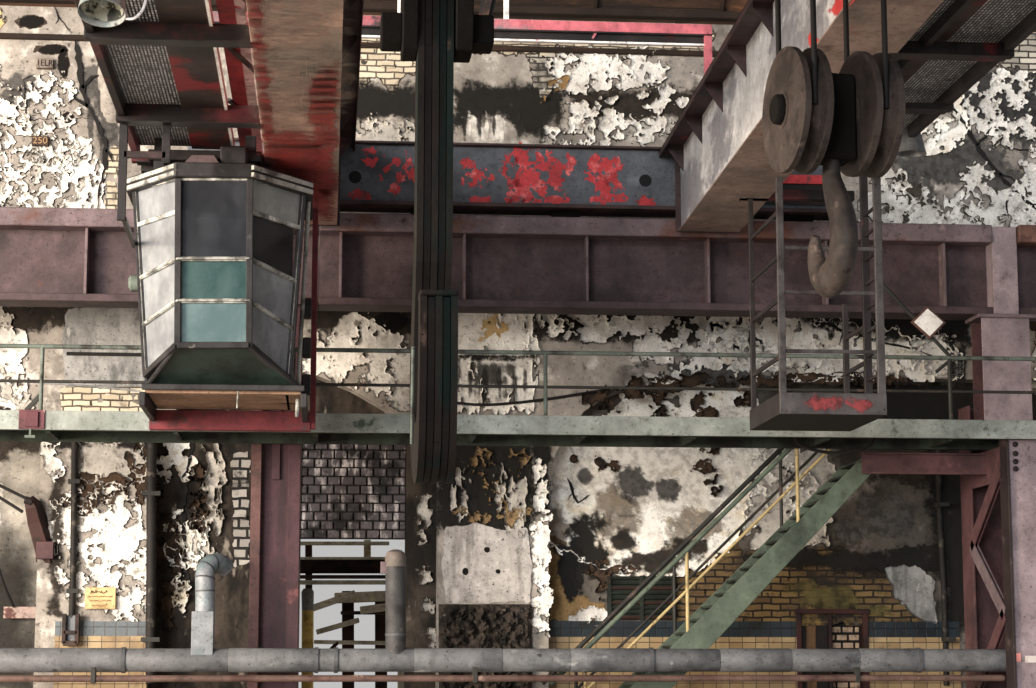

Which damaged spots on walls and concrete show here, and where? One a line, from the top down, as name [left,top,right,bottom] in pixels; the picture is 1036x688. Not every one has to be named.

peeling [0,44,119,209]
water stain [357,79,415,124]
flaking render [359,39,415,92]
water stain [453,79,697,143]
peeling [493,29,716,146]
peeling [0,306,39,410]
peeling [302,312,410,412]
peeling [457,313,964,418]
peeling [39,442,251,631]
water stain [430,446,756,603]
spalling [414,446,836,649]
flaking render [735,517,938,626]